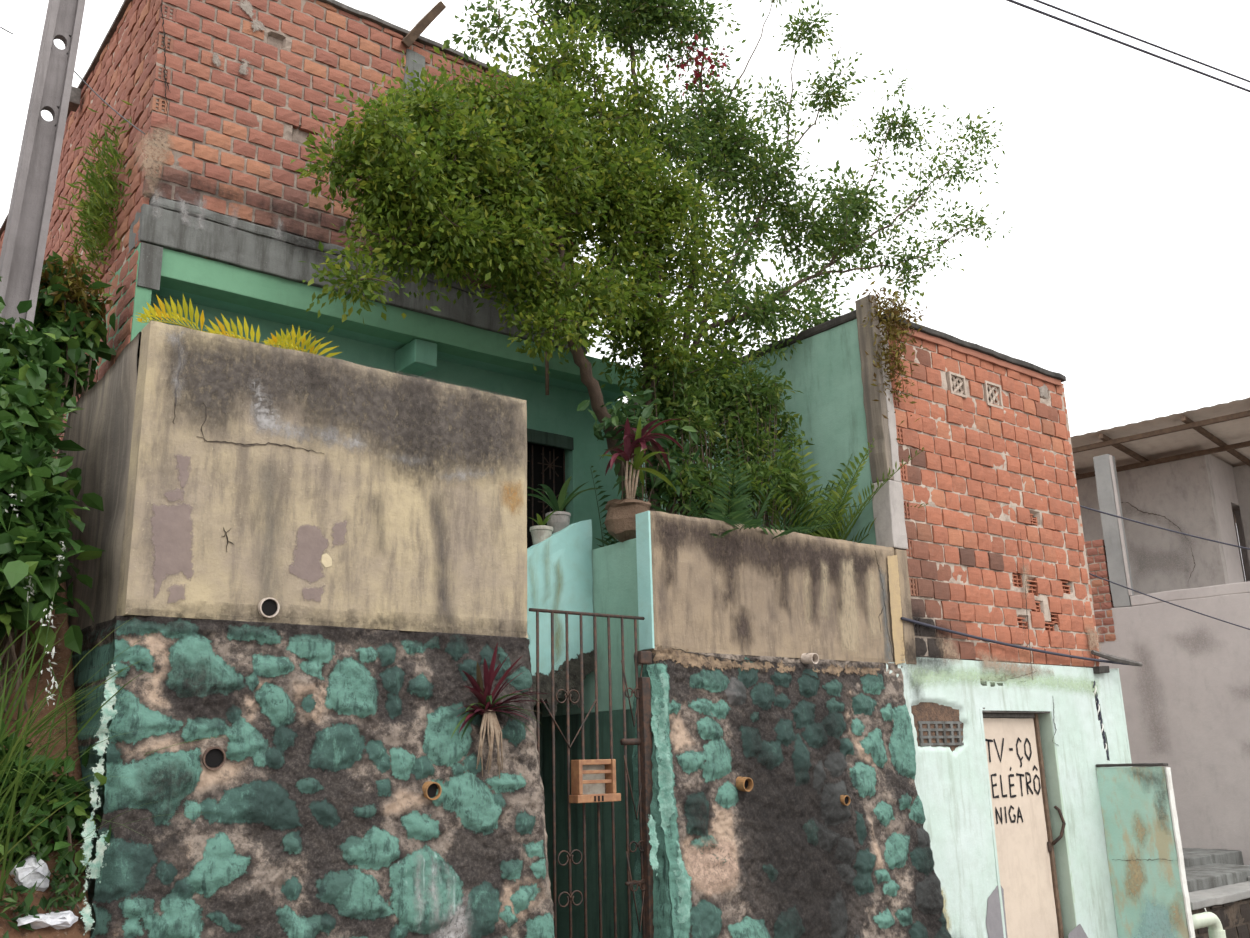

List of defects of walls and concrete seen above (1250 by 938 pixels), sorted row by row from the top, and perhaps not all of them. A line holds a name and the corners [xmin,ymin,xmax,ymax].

crack [173,332,324,454]
damp [171,336,519,475]
peeling [151,455,194,603]
peeling [289,521,347,602]
damp [658,517,891,661]
flaking render [911,702,964,751]